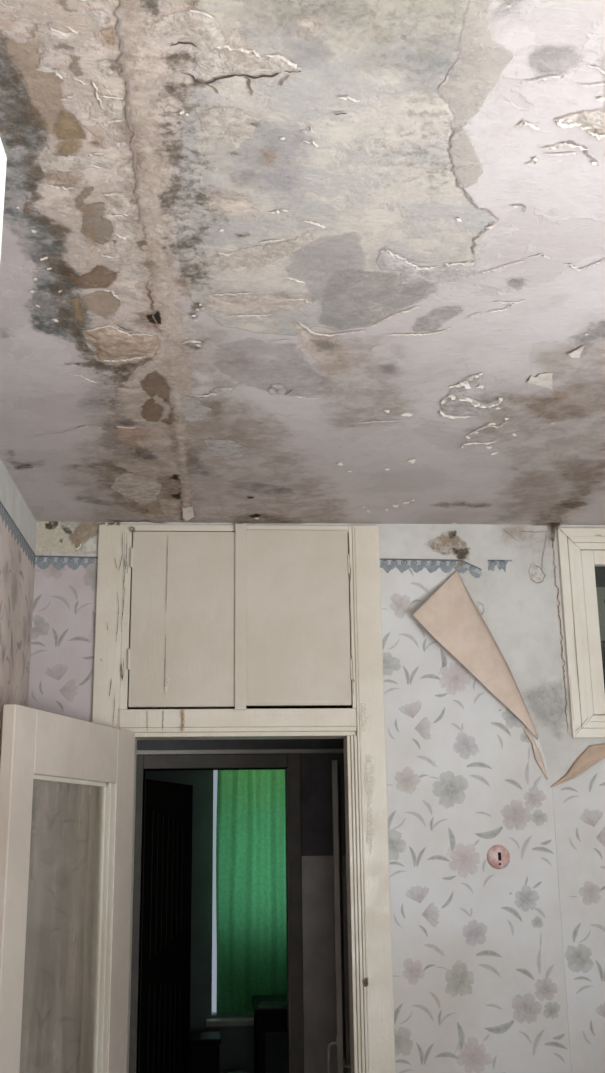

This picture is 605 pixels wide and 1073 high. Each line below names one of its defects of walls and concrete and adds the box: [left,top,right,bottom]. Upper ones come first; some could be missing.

peeling [4,27,86,140]
crack [183,71,301,95]
peeling [524,48,605,140]
peeling [153,0,513,375]
leakage [0,0,224,520]
peeling [114,221,152,283]
peeling [440,372,517,455]
peeling [528,373,553,390]
flaking render [38,521,135,552]
peeling [111,473,162,502]
peeling [182,507,194,521]
leakage [503,465,603,547]